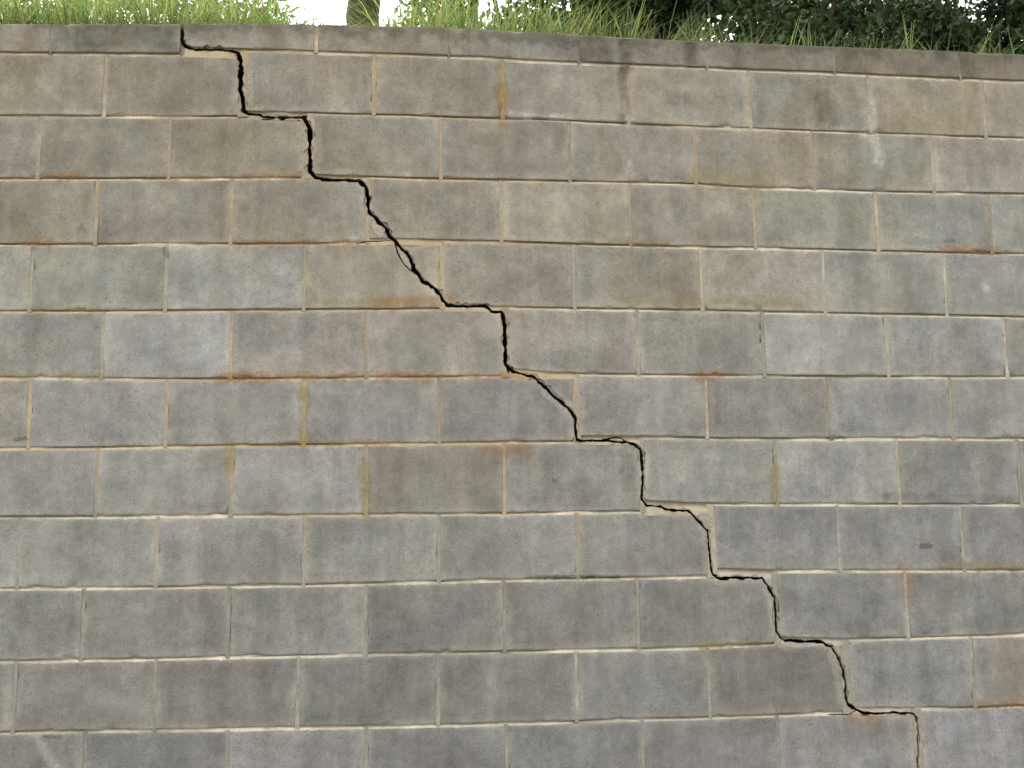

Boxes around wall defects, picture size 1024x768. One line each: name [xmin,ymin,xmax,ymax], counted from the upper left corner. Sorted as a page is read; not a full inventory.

crack [181,28,918,762]